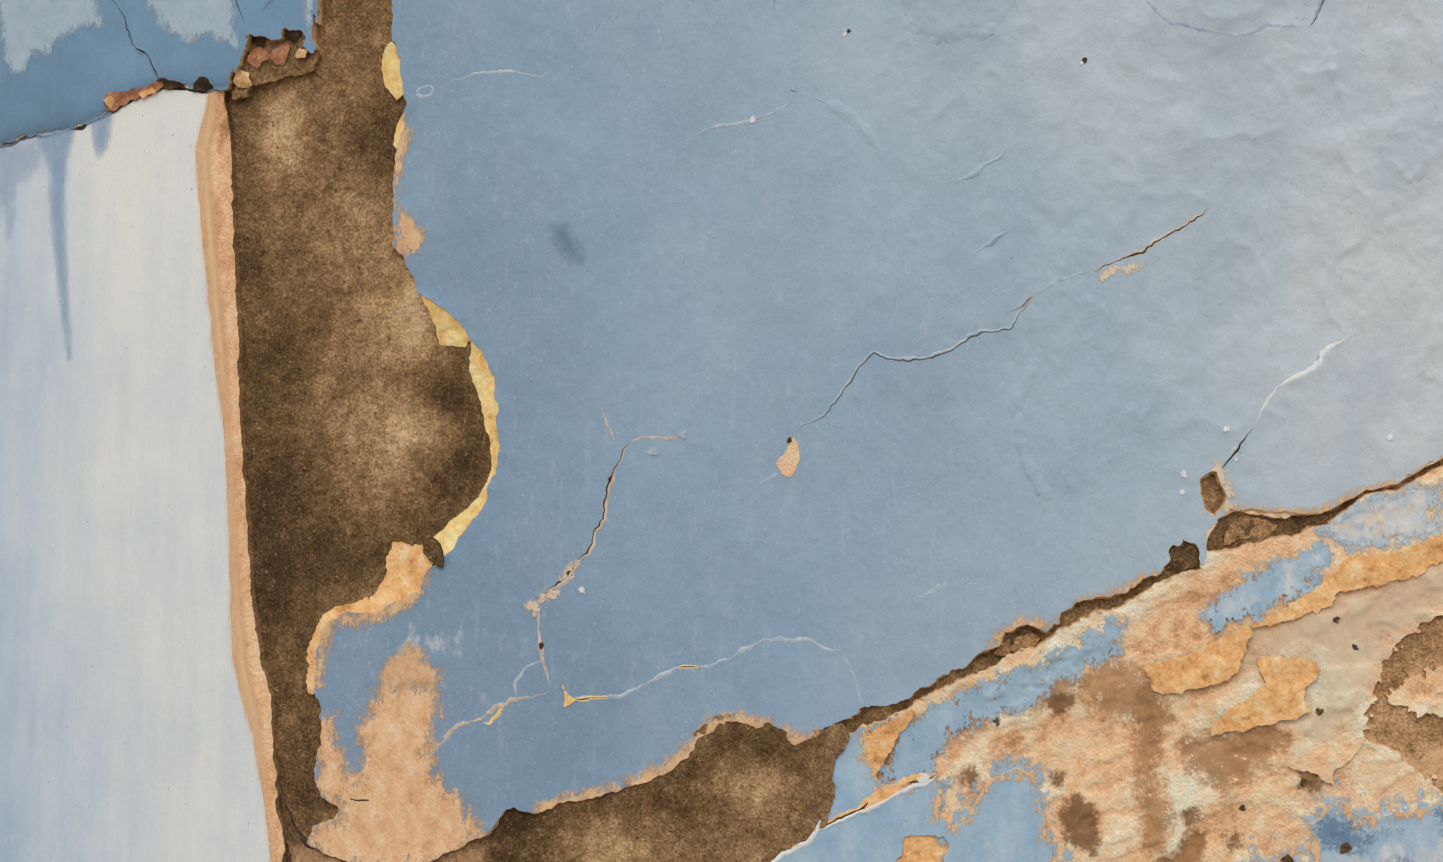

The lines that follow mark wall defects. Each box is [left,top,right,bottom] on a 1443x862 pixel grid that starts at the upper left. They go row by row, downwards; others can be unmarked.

flaking render [103,81,164,112]
peeling [147,0,239,49]
flaking render [229,0,849,862]
crack [427,335,1443,757]
crack [757,209,1207,565]
flaking render [856,458,1443,862]